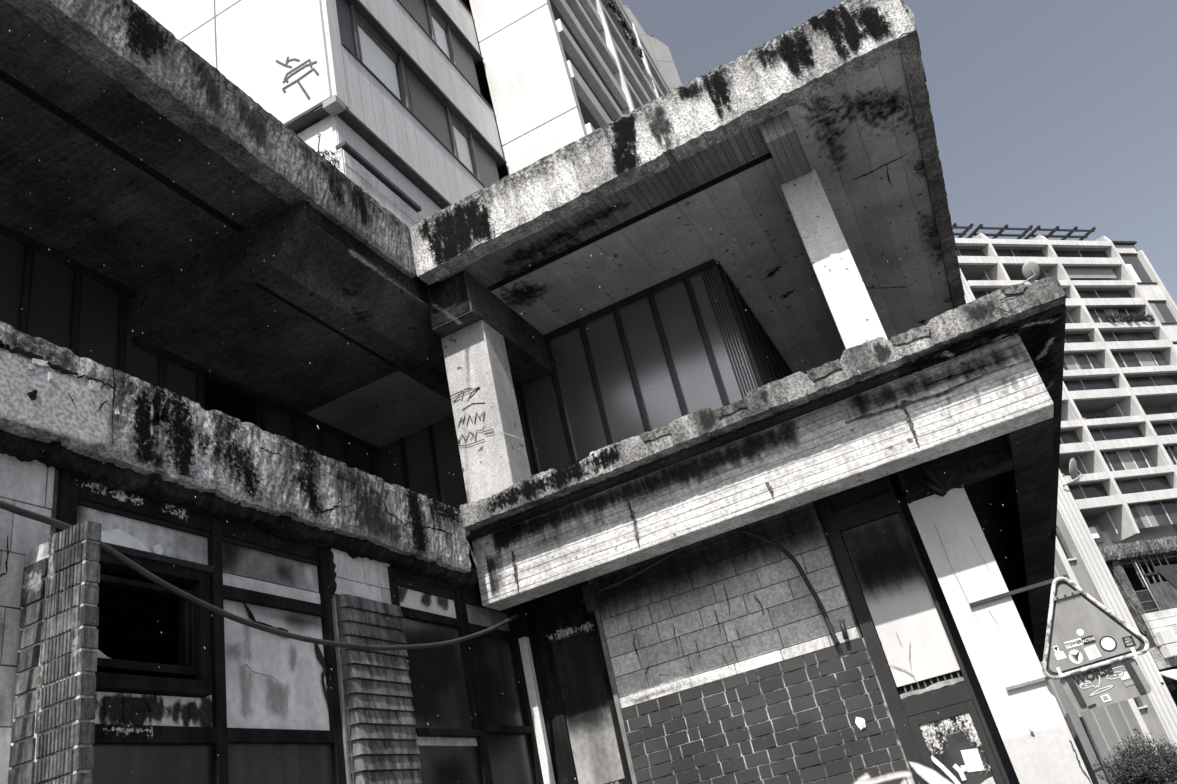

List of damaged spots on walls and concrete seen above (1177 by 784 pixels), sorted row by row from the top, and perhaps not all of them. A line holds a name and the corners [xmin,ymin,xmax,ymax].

leakage [122,0,170,65]
leakage [754,2,893,80]
leakage [675,68,731,118]
leakage [323,164,373,226]
leakage [606,105,679,175]
crack [852,152,910,185]
leakage [418,201,498,266]
leakage [128,374,263,500]
leakage [289,443,324,517]
crack [310,468,457,546]
leakage [342,423,797,595]
crack [0,535,9,577]